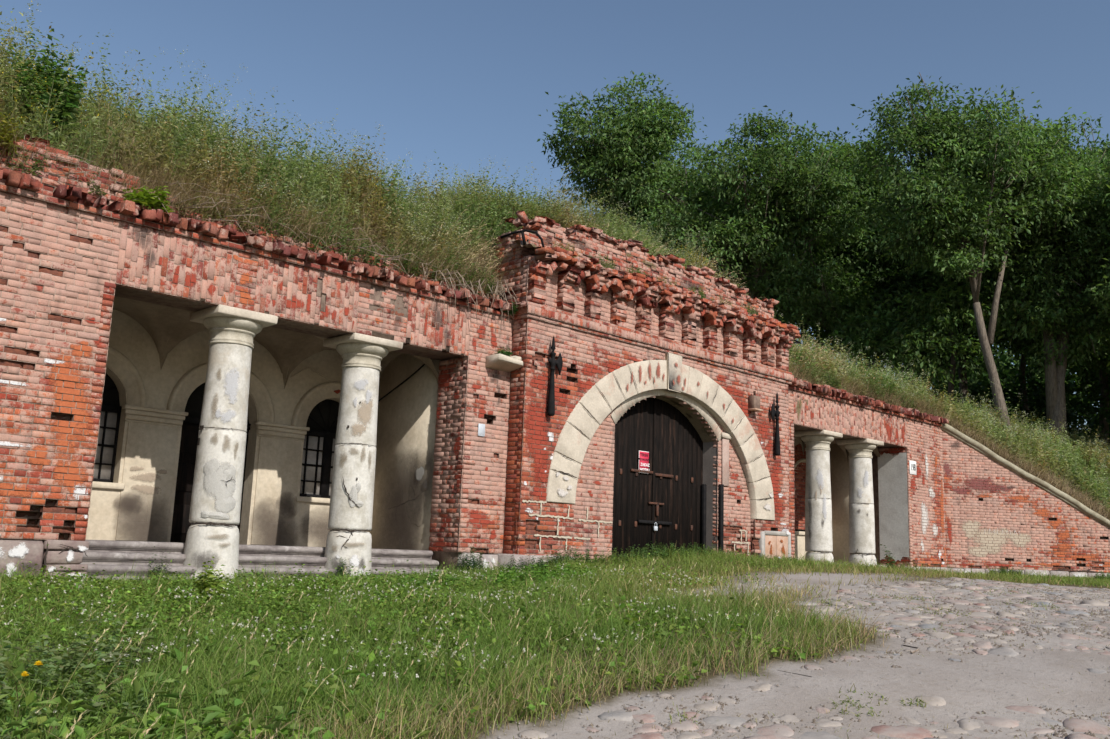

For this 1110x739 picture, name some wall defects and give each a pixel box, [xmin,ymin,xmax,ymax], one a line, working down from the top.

peeling [0,314,103,581]
water stain [115,499,158,542]
water stain [259,498,293,546]
crack [329,476,372,550]